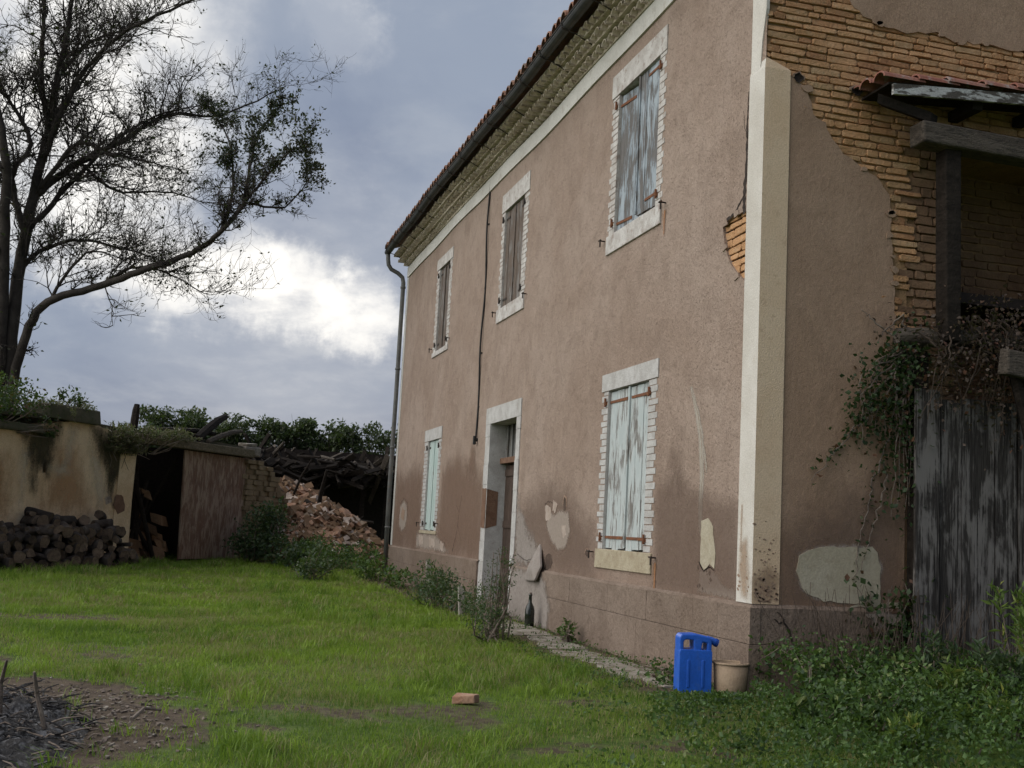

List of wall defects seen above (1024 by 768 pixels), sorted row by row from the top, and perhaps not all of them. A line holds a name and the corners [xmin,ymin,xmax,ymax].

flaking render [766,0,1024,332]
flaking render [722,210,746,281]
damp [25,422,74,490]
flaking render [545,495,570,549]
peeling [697,518,779,603]